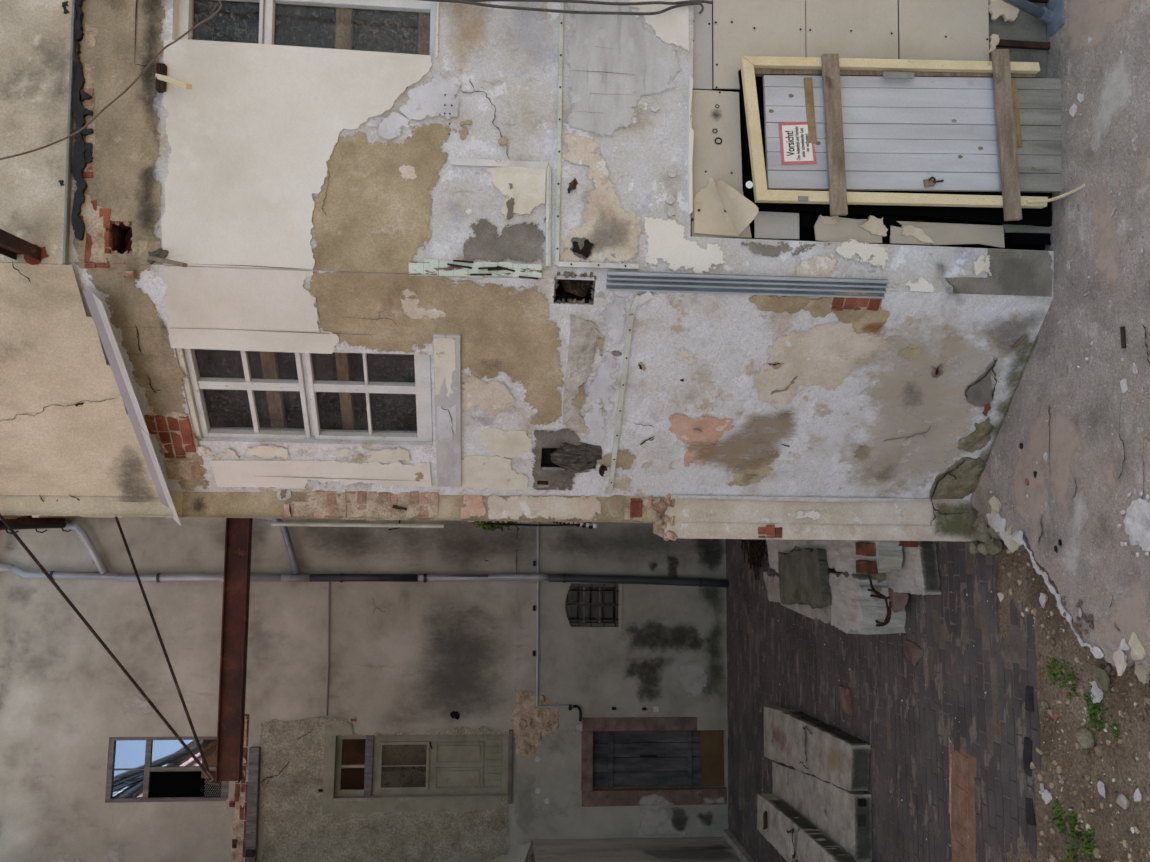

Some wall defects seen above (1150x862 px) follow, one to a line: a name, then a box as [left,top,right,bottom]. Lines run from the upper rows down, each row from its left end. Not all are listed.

peeling [72,0,734,541]
peeling [741,239,889,277]
peeling [905,277,934,292]
flaking render [749,292,921,409]
crack [1,398,113,421]
flaking render [728,444,790,486]
peeling [852,446,870,462]
spalling [929,359,996,499]
leakage [627,623,702,700]
flaking render [509,690,560,758]